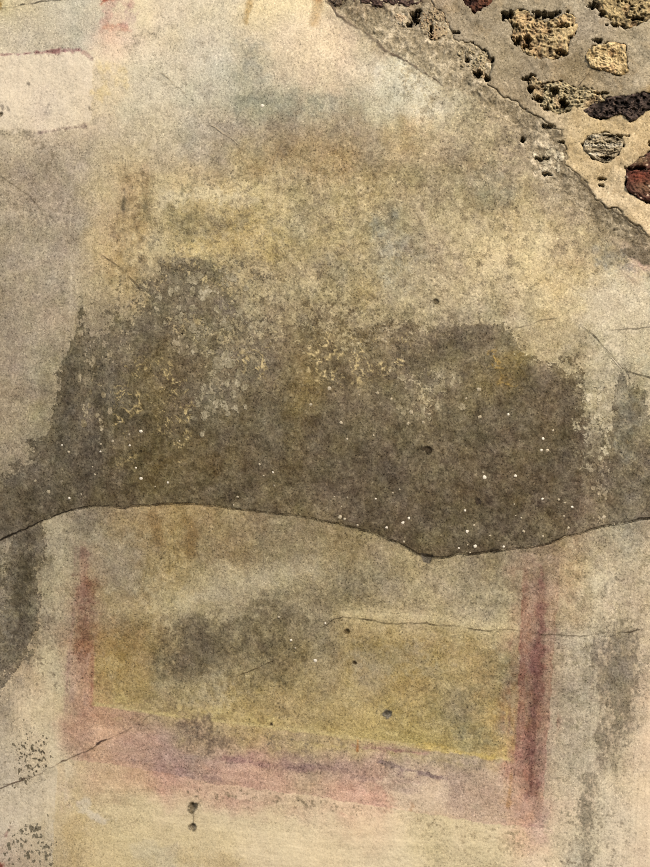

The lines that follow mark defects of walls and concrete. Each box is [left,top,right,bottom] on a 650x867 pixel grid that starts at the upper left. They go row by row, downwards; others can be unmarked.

spalling [325,0,650,265]
crack [576,322,650,377]
water stain [0,219,650,696]
crack [0,502,190,541]
crack [320,520,609,558]
water stain [590,626,641,760]
water stain [12,719,52,788]
crack [1,733,120,788]